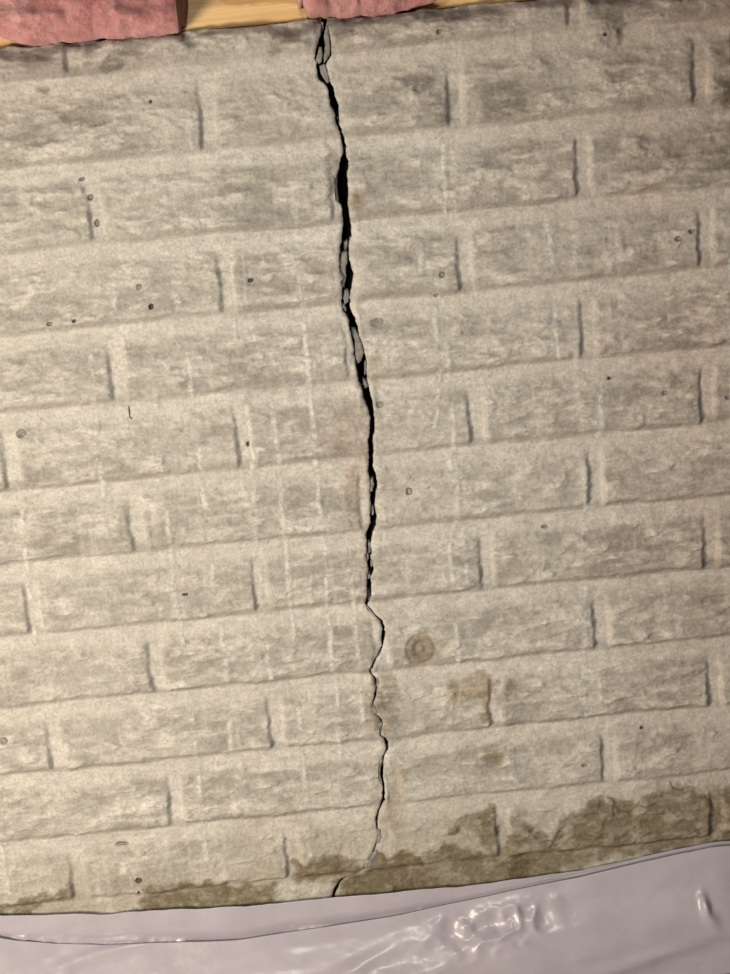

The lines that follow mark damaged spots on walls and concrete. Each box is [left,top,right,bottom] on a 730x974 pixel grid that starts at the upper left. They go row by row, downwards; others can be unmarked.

leakage [237,401,296,640]
crack [315,19,388,851]
leakage [239,883,327,906]
crack [332,872,357,897]